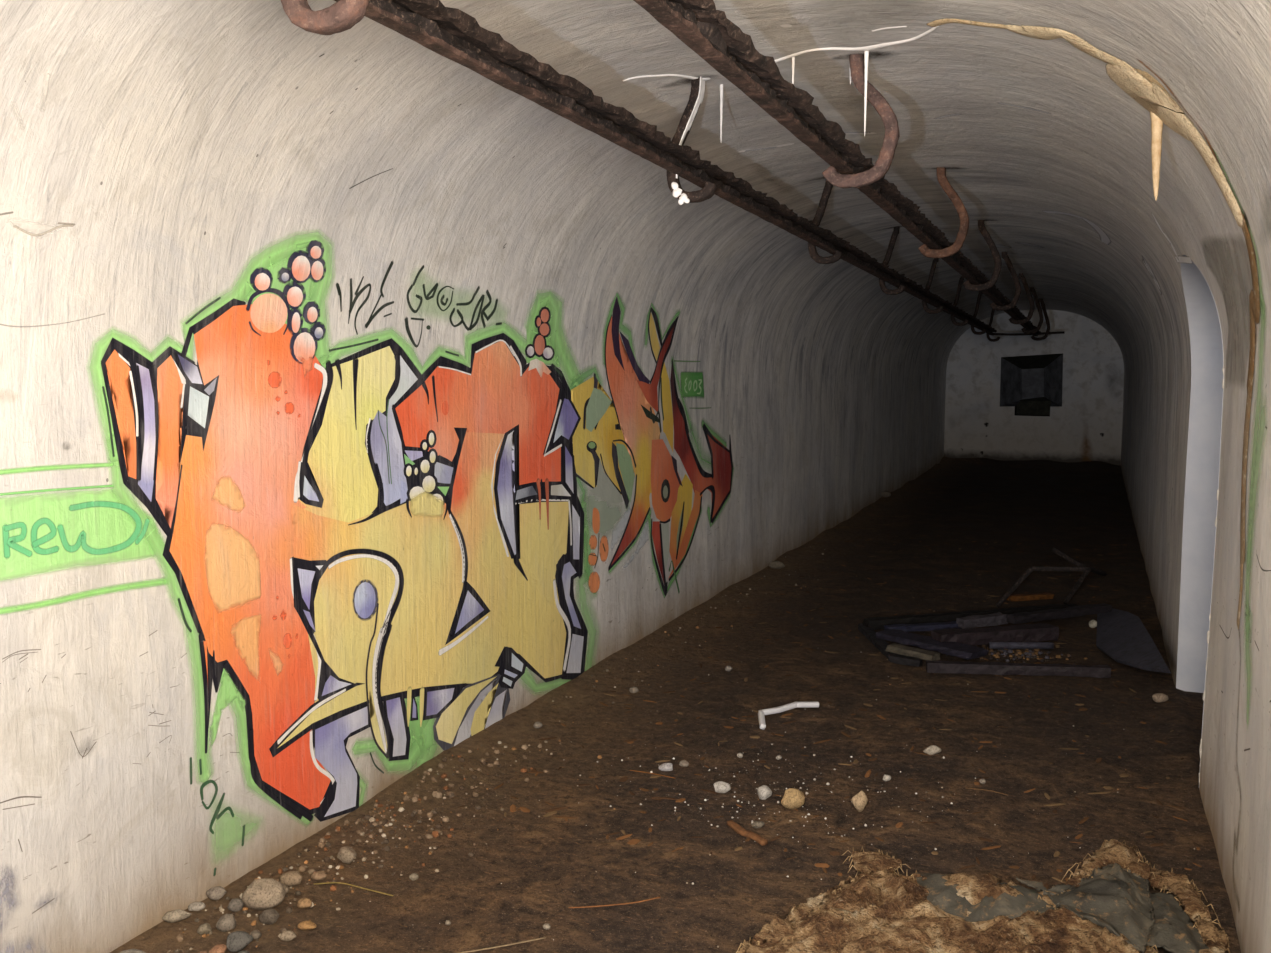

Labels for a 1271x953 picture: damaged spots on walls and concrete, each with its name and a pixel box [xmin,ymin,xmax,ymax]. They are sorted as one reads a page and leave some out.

crack [622,74,711,82]
crack [775,19,1260,654]